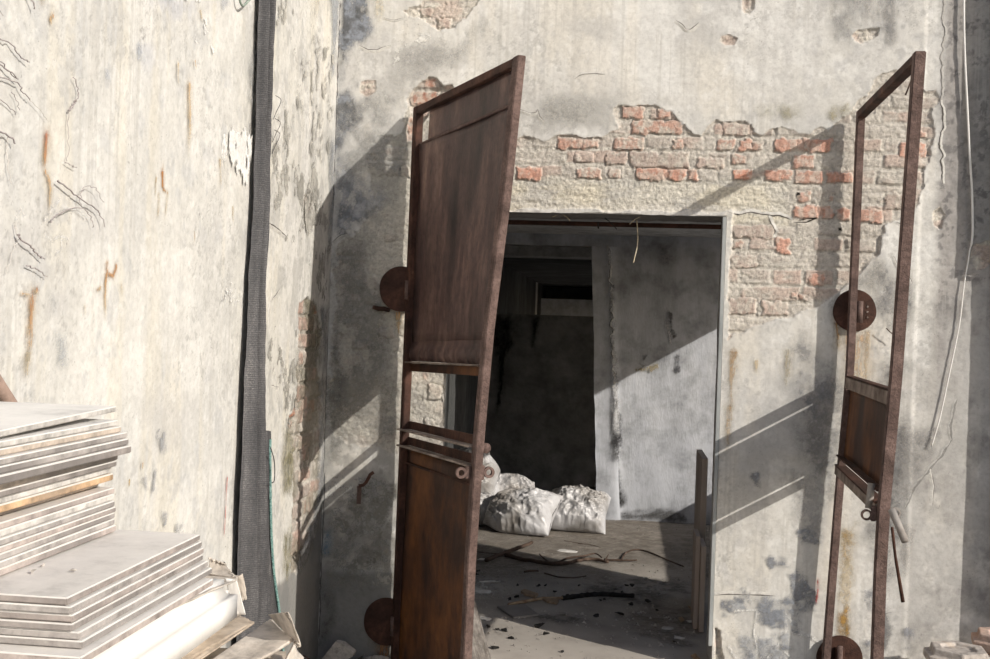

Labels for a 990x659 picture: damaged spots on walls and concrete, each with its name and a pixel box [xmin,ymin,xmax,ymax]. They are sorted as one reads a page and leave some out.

damp [331,0,373,71]
flaking render [392,0,479,65]
crack [938,0,947,184]
corrosion [44,133,52,205]
flaking render [221,123,253,187]
flaking render [510,68,911,341]
flaking render [915,90,940,209]
corrosion [20,288,38,375]
flaking render [265,29,454,575]
damp [494,316,513,408]
crack [903,399,957,510]